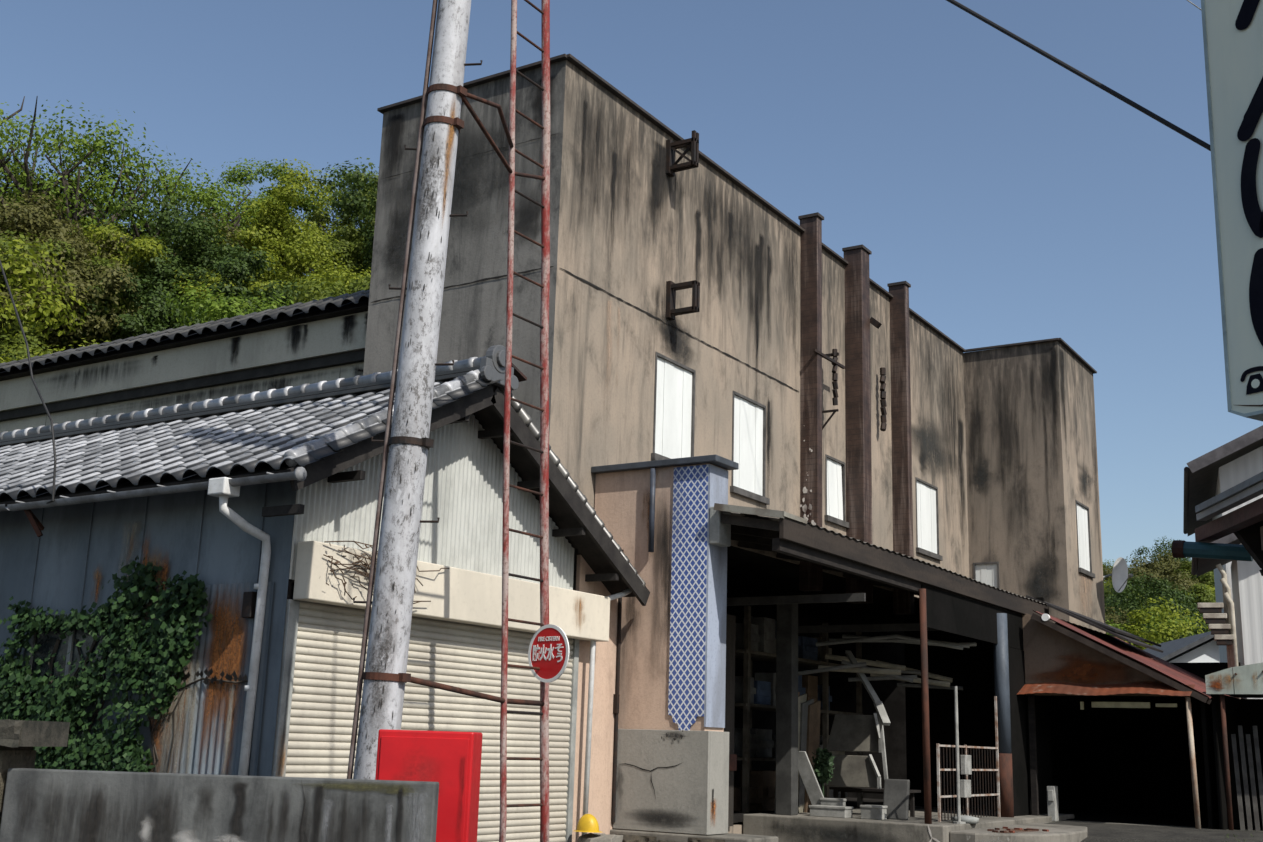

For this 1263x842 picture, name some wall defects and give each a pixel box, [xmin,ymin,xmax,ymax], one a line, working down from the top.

water stain [535,77,553,130]
corrosion [444,111,455,206]
water stain [451,135,507,209]
water stain [696,197,771,352]
water stain [656,292,689,358]
water stain [1031,349,1065,461]
water stain [911,386,989,530]
corrosion [205,599,244,744]
corrosion [1041,657,1123,684]
corrosion [1209,675,1231,690]
water stain [218,783,246,842]
crack [624,763,681,799]